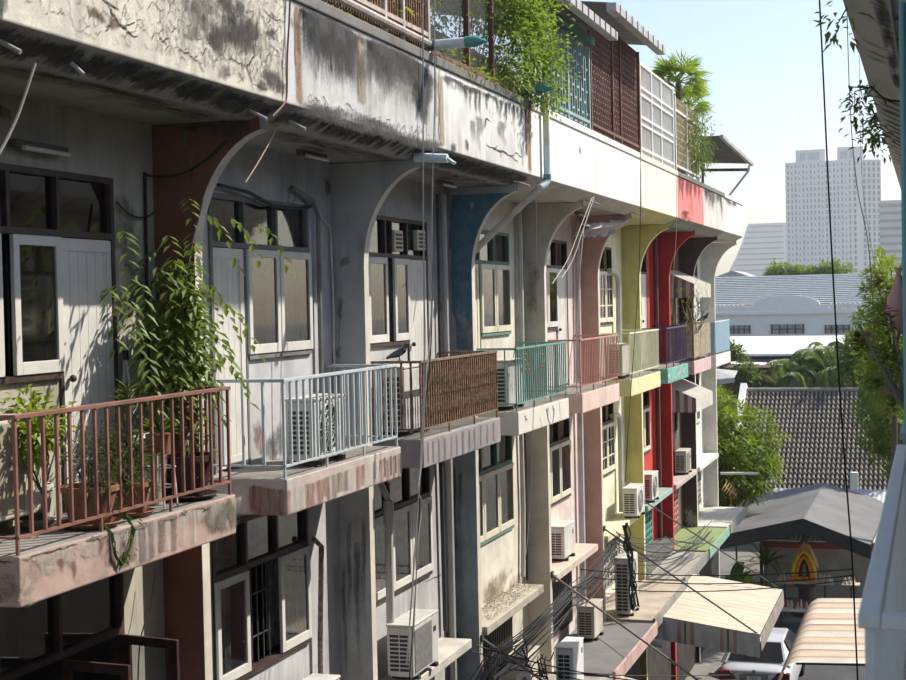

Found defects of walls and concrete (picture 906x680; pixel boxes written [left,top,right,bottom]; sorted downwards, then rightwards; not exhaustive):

crack [27,0,287,93]
leakage [0,0,528,185]
crack [486,143,521,161]
crack [0,529,132,564]